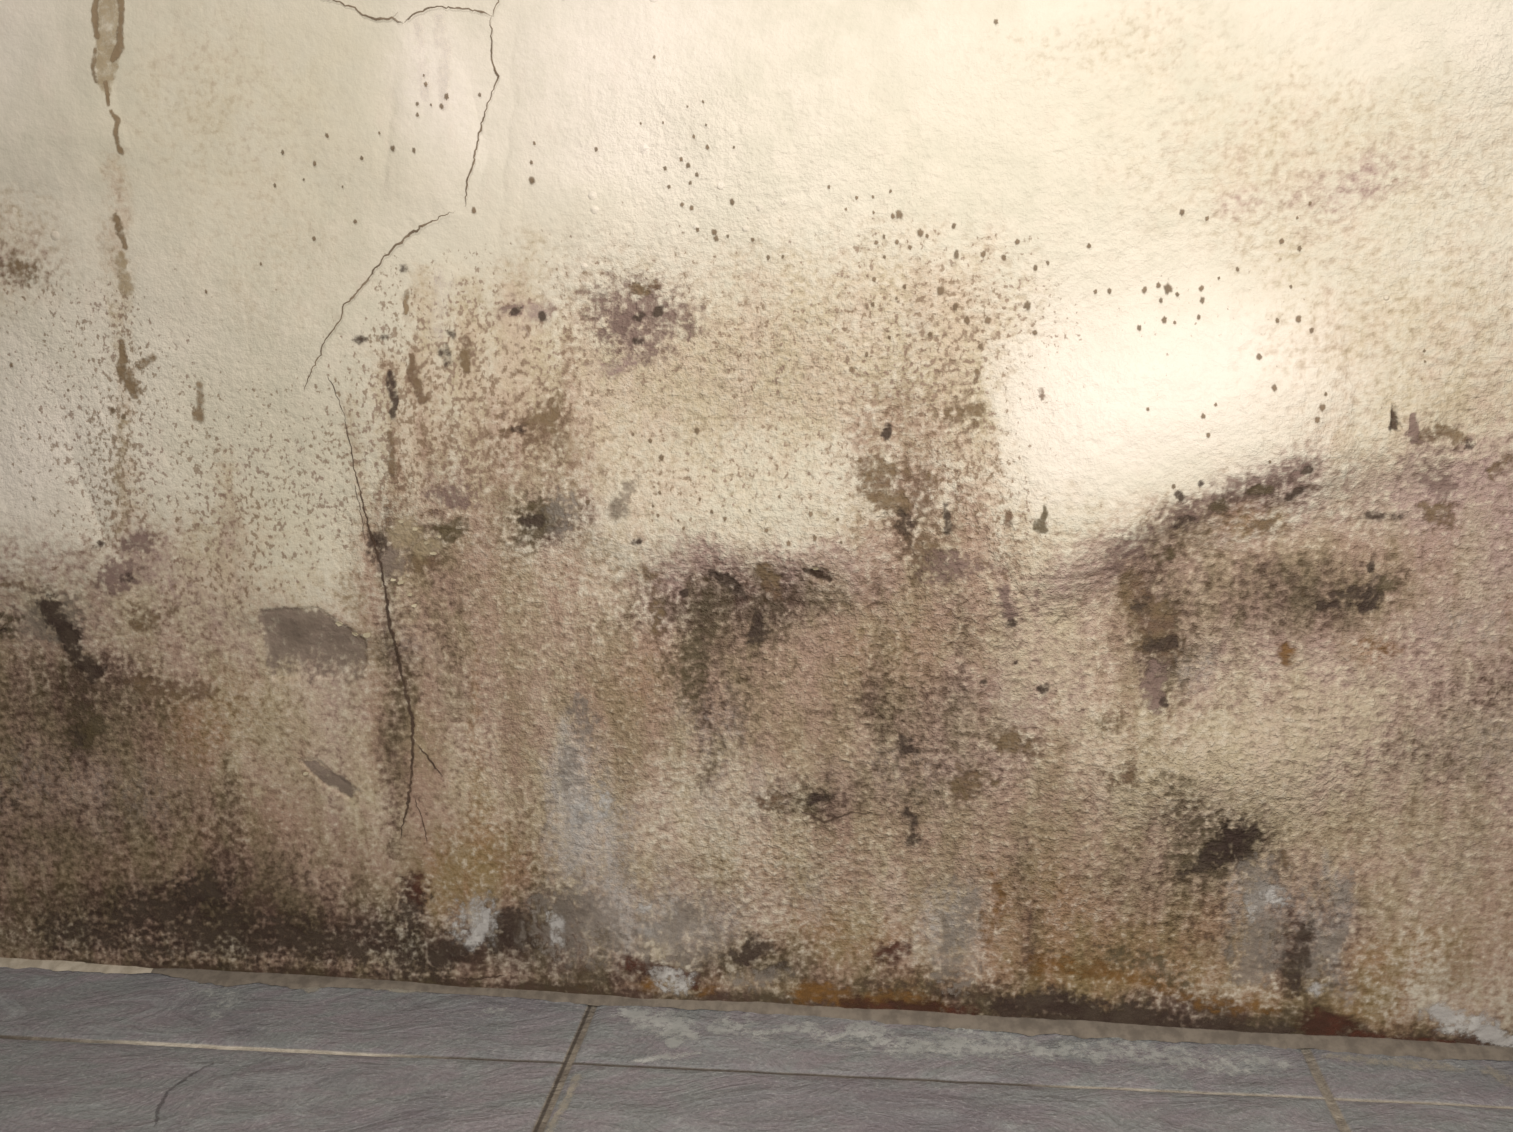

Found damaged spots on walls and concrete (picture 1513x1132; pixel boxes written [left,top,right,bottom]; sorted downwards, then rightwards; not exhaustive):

water stain [579,274,703,373]
water stain [1142,282,1179,324]
crack [304,0,500,840]
water stain [386,354,428,474]
water stain [1408,413,1473,449]
water stain [857,457,992,585]
water stain [1033,506,1048,533]
water stain [0,582,107,684]
water stain [1107,460,1313,713]
water stain [35,871,564,993]
water stain [619,956,1296,1076]
water stain [1419,1003,1513,1047]